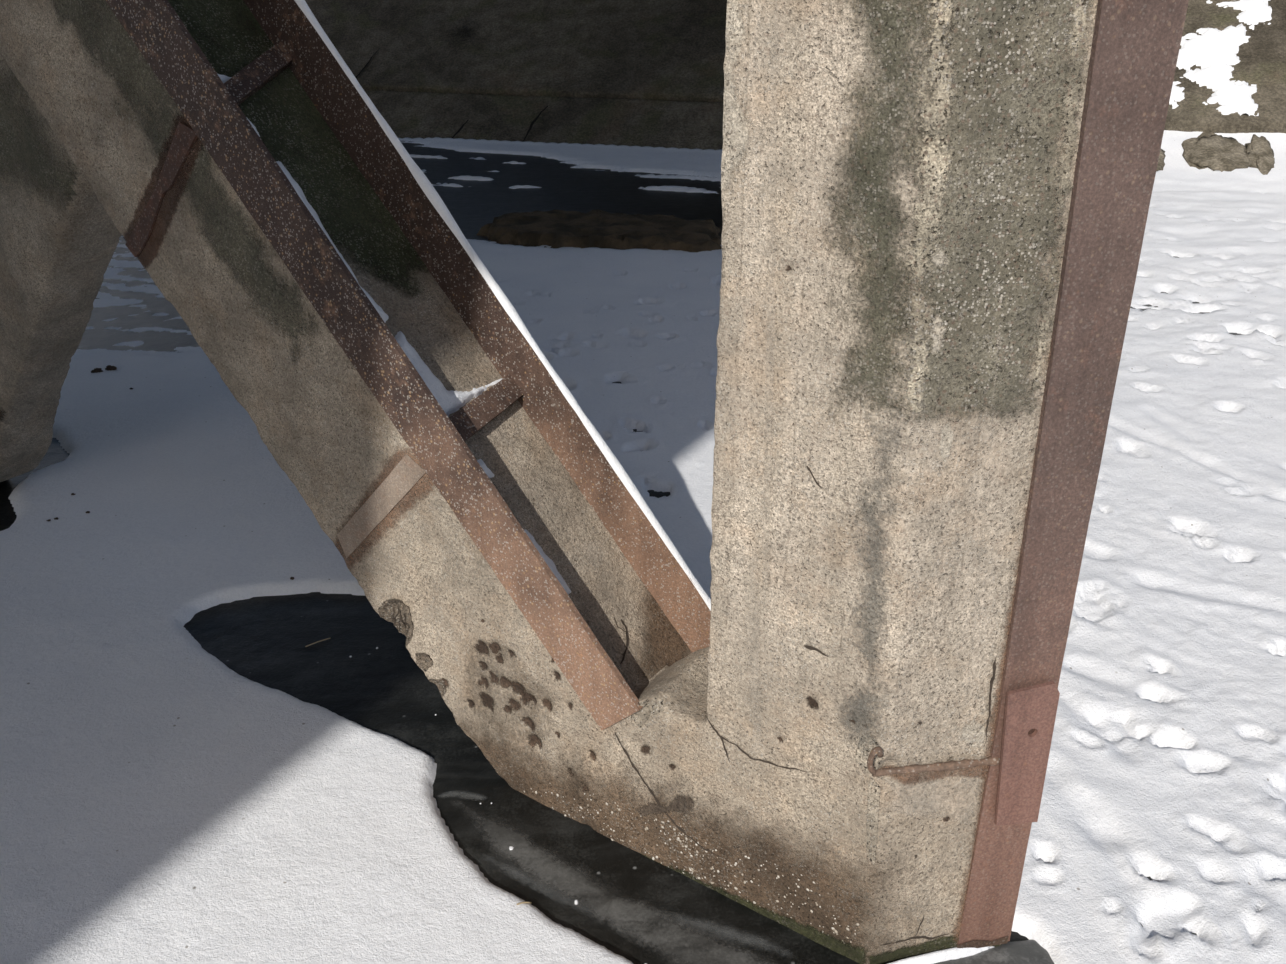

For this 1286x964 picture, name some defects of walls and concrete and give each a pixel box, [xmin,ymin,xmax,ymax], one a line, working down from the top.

leakage [53,0,186,159]
rust [124,116,203,269]
leakage [183,144,313,362]
leakage [823,0,1093,672]
rust [335,450,434,570]
spalling [467,640,552,748]
crack [615,733,725,859]
leakage [465,729,878,960]
crack [707,718,818,774]
leakage [840,691,878,750]
rust [881,556,1021,948]